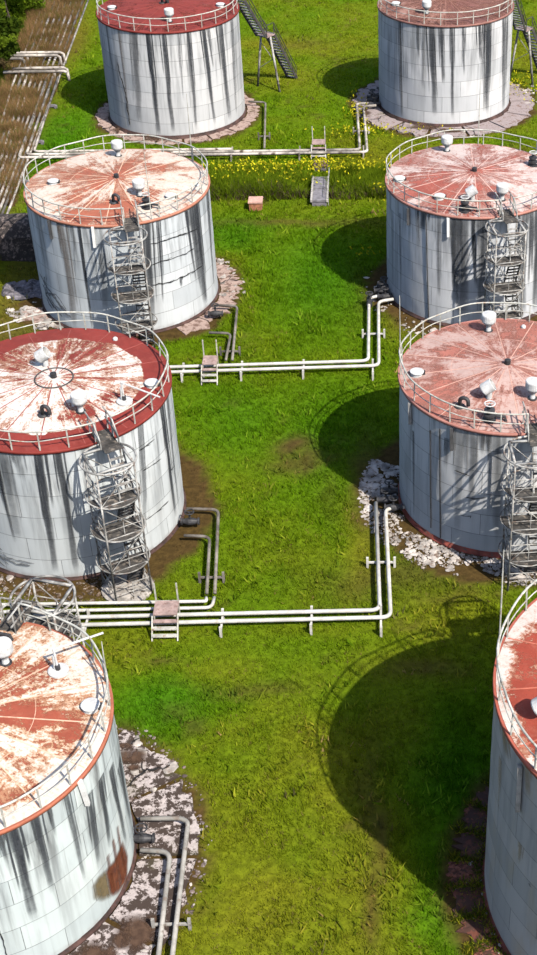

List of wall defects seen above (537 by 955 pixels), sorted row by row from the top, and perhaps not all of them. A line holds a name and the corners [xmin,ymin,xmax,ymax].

water stain [146,34,173,126]
water stain [179,24,235,112]
water stain [416,16,508,104]
water stain [142,220,163,305]
water stain [185,193,213,293]
water stain [452,219,488,297]
water stain [518,211,537,296]
water stain [160,398,175,506]
water stain [34,453,76,562]
water stain [64,758,128,849]
water stain [0,811,52,910]
rust [94,827,128,899]